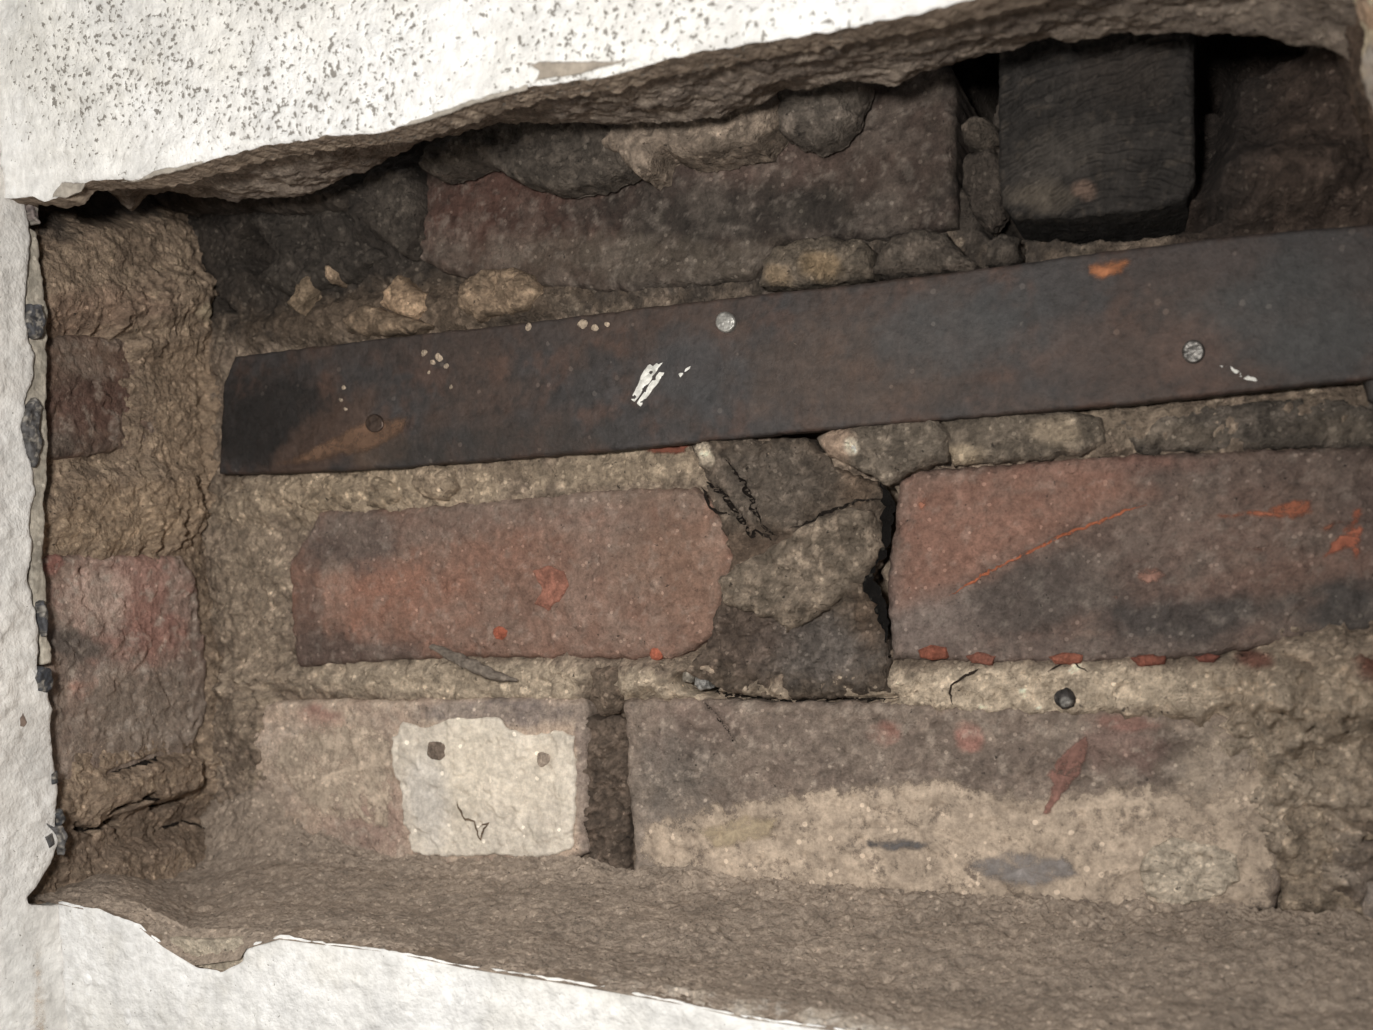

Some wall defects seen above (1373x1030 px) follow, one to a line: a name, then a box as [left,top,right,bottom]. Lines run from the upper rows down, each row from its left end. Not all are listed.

spalling [1354,0,1373,107]
spalling [405,61,622,125]
spalling [53,182,85,198]
corrosion [1091,261,1127,277]
peeling [21,204,54,693]
corrosion [296,419,404,462]
spalling [1049,652,1083,665]
spalling [1130,654,1166,667]
peeling [391,717,577,857]
spalling [1043,736,1088,814]
peeling [45,808,68,855]
spalling [170,936,247,971]